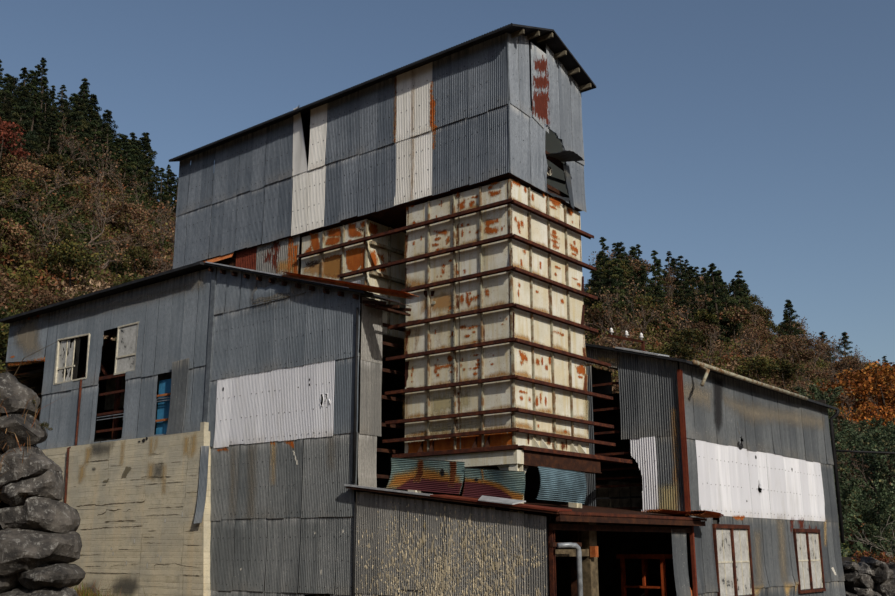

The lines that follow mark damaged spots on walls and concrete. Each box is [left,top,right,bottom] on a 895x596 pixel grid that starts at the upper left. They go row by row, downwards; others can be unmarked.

rust [530,42,550,133]
rust [262,221,386,278]
rust [404,179,584,389]
rust [388,325,588,500]